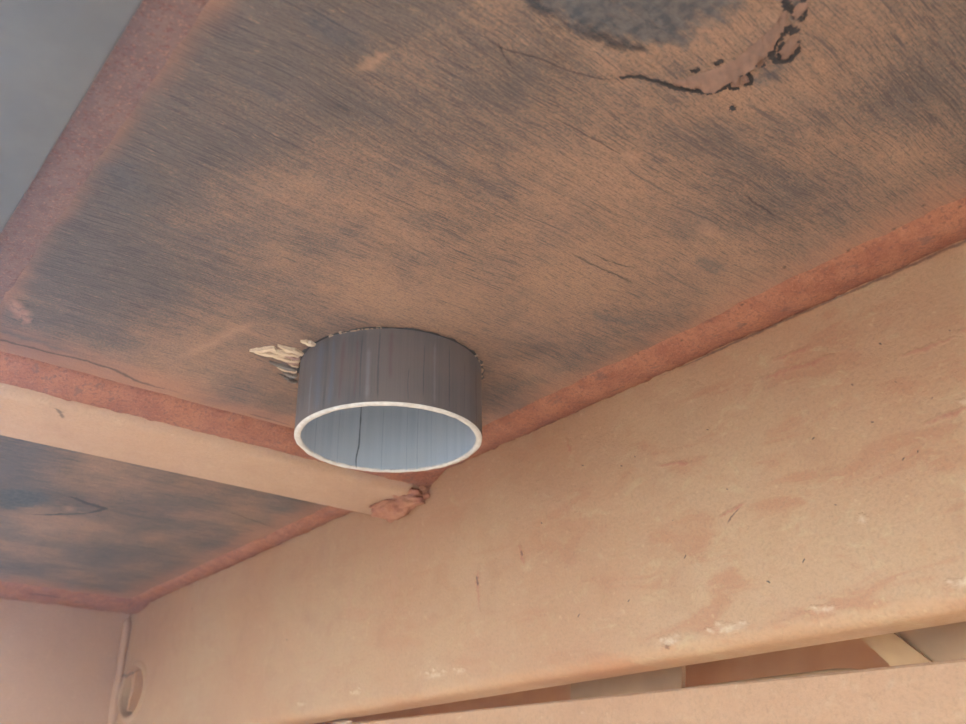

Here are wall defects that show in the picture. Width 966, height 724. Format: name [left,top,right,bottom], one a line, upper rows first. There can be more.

peeling [791,1,808,19]
leakage [522,0,755,55]
peeling [777,35,800,59]
leakage [0,488,57,510]